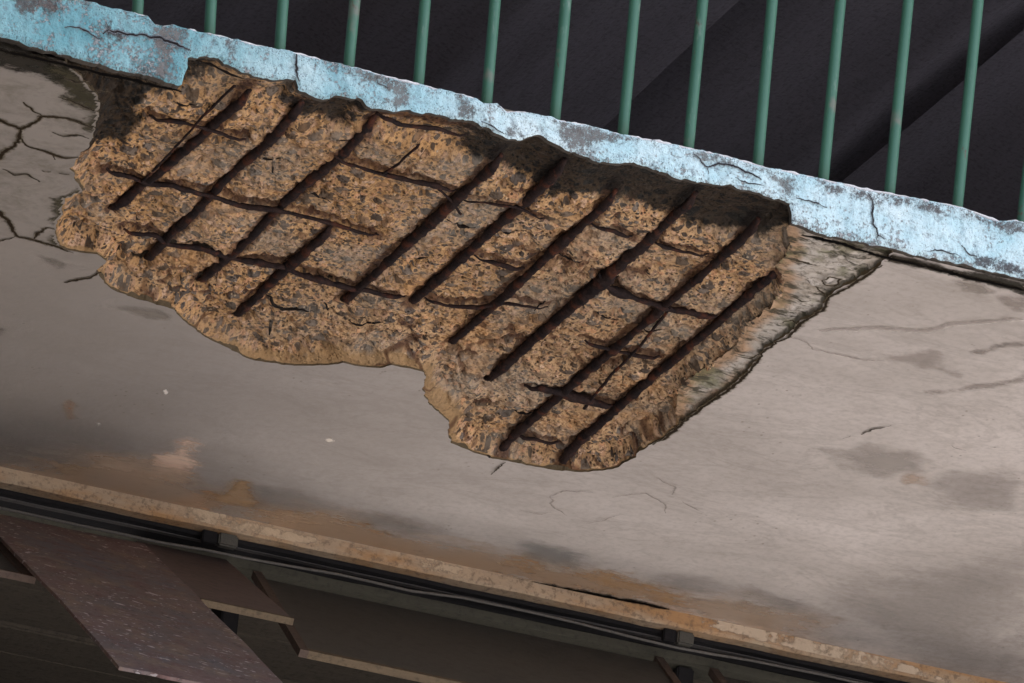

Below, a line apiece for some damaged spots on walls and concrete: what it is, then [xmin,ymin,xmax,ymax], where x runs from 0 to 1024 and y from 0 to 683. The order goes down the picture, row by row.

crack [0,211,72,253]
crack [0,49,182,182]
spalling [56,27,895,471]
crack [693,153,764,186]
crack [652,193,1024,445]